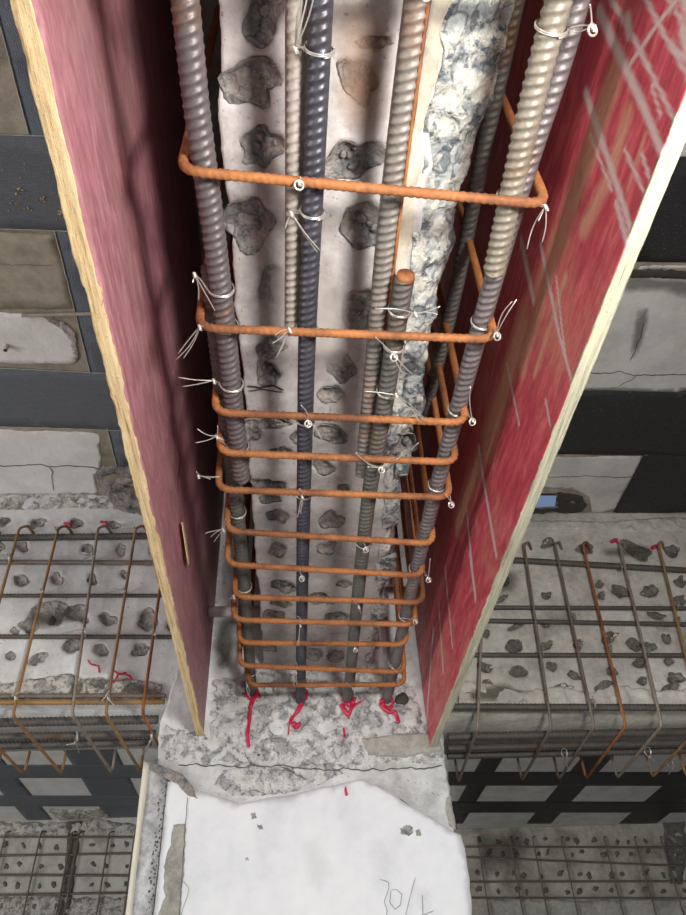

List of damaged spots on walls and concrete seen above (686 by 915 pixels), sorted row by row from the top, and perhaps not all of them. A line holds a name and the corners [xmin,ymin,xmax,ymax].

crack [593,324,686,387]
spalling [146,0,515,799]
crack [0,464,100,490]
crack [179,752,442,787]
crack [147,780,189,915]